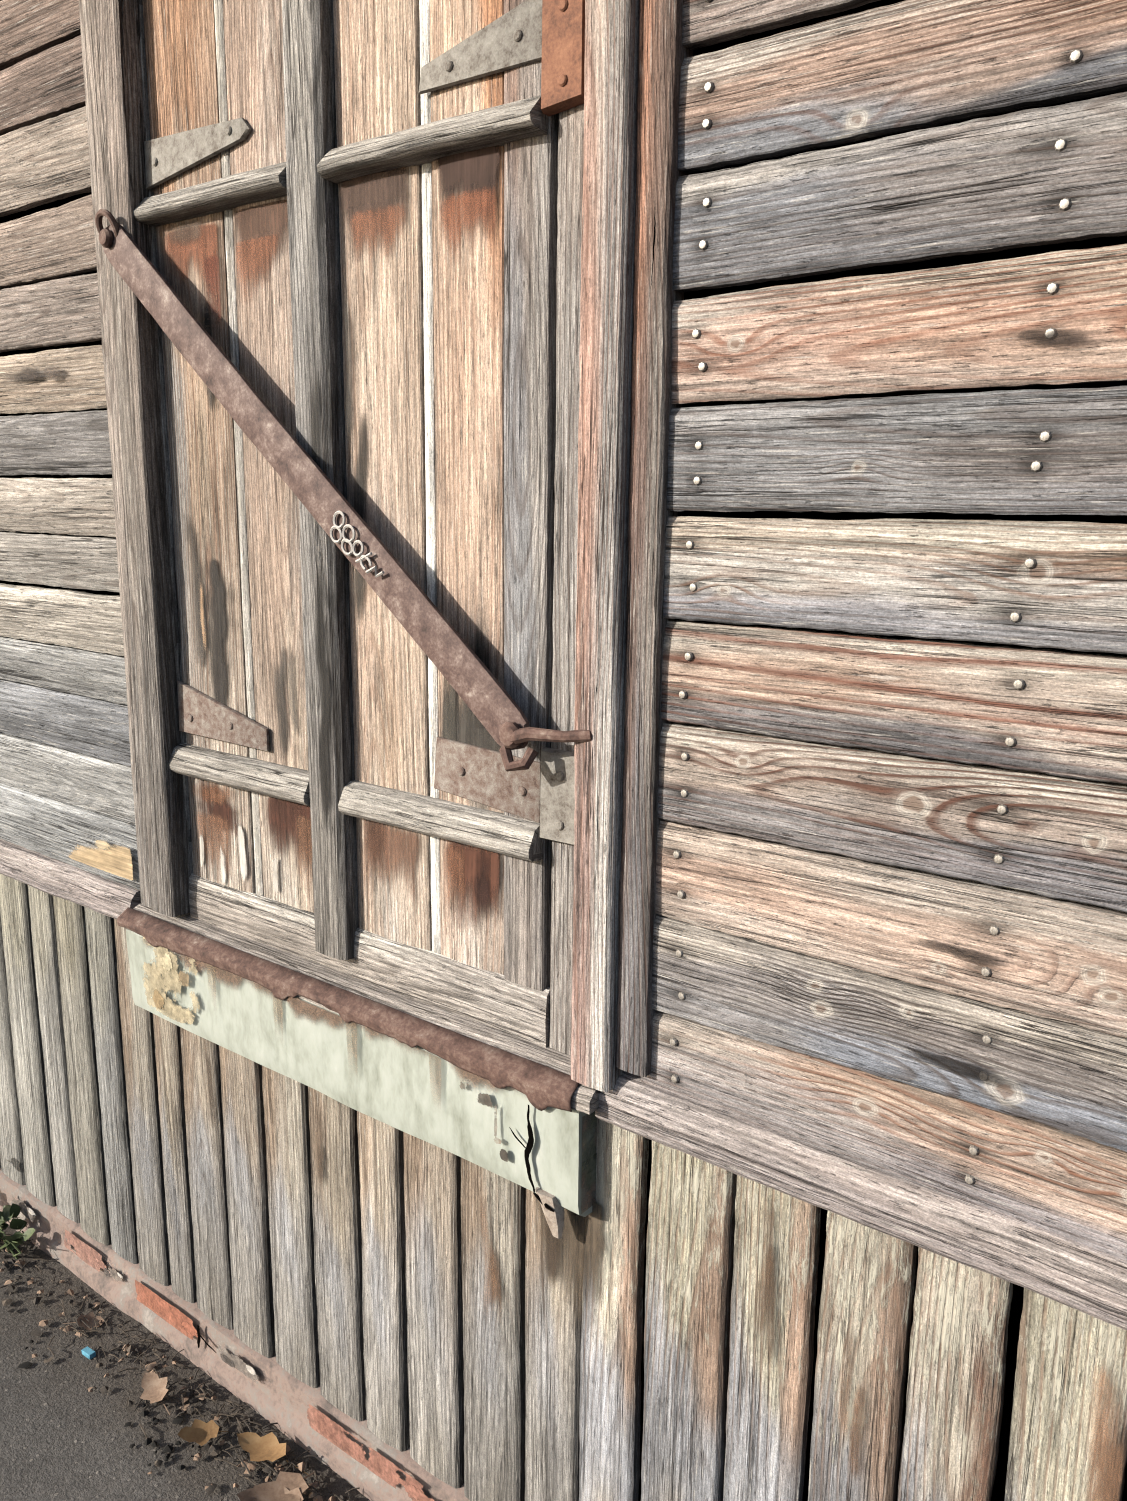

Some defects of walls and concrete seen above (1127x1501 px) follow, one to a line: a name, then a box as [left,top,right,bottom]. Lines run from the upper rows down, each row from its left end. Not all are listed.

rust [165,221,221,319]
rust [235,199,288,281]
rust [172,951,428,1053]
peeling [459,1082,508,1162]
crack [509,1105,554,1212]
spalling [535,1187,564,1239]